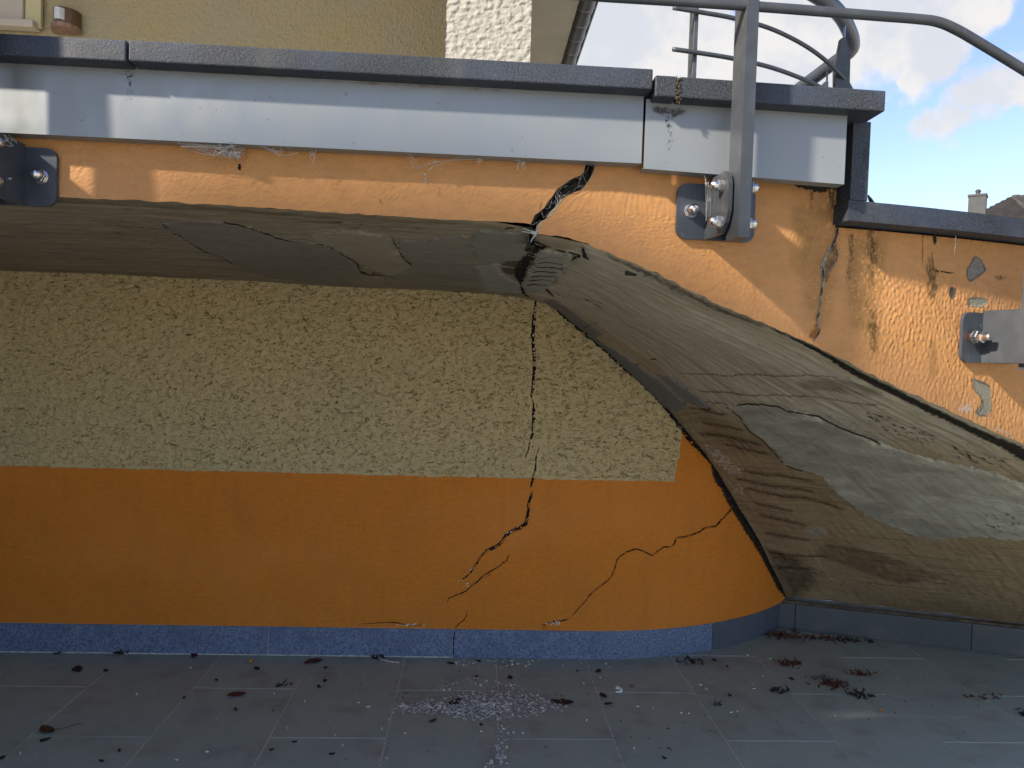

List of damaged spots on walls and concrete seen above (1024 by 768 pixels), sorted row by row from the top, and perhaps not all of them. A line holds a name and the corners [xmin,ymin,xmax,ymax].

crack [813,225,839,342]
damp [922,251,952,297]
peeling [967,256,987,282]
crack [447,165,787,655]
damp [611,258,1024,461]
peeling [972,378,992,416]